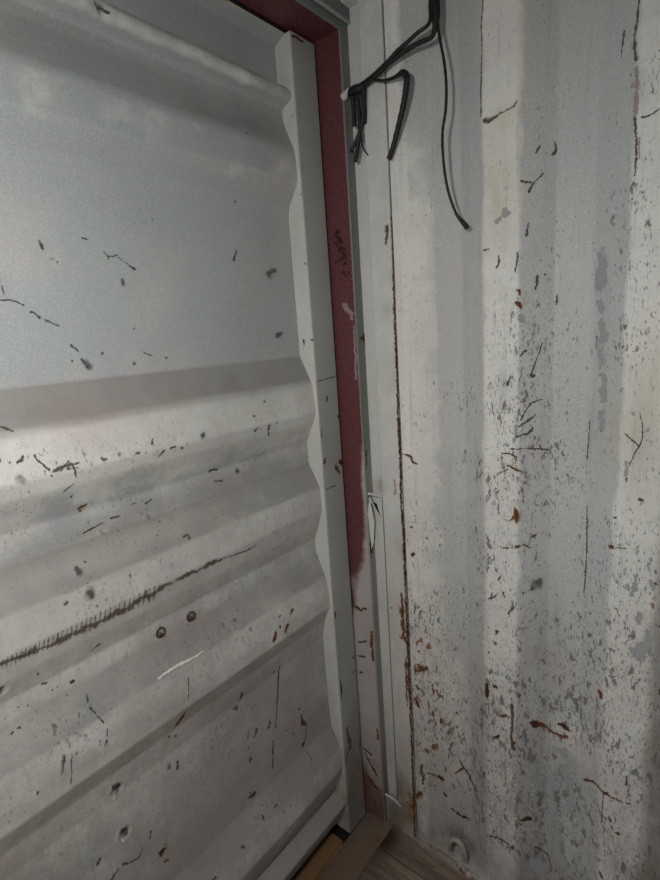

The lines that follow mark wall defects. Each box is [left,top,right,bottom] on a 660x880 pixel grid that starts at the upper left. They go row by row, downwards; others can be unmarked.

corrosion [390,216,444,837]